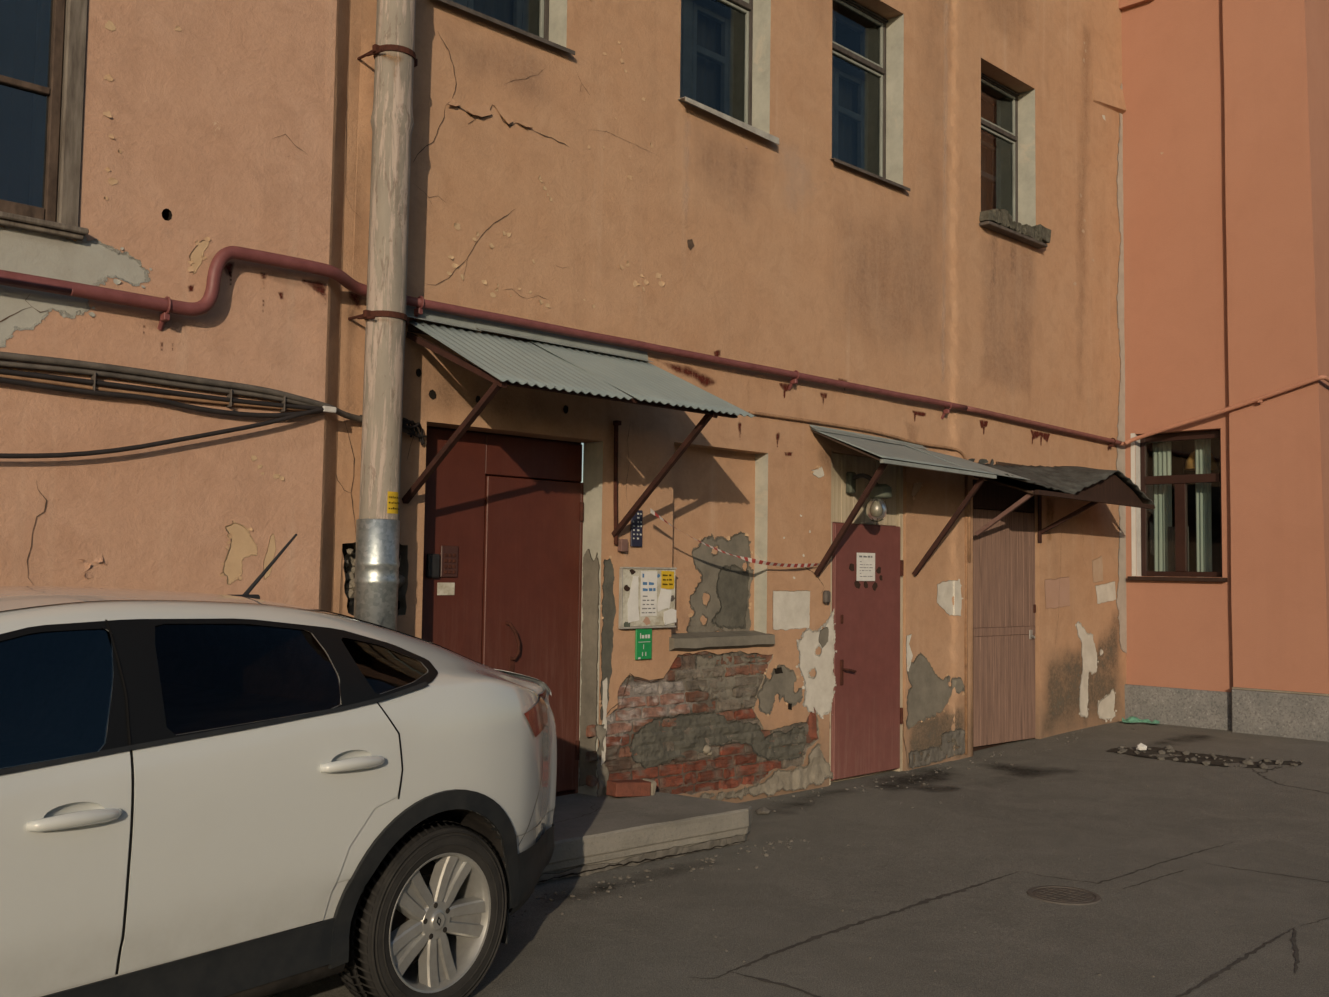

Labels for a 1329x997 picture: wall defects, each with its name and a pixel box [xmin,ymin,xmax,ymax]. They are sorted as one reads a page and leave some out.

crack [413,32,660,206]
peeling [0,227,152,348]
crack [429,209,515,285]
corrosion [670,364,714,386]
corrosion [1031,430,1050,444]
crack [27,481,47,584]
peeling [219,521,276,585]
flaking render [686,531,754,633]
spalling [579,549,837,801]
spalling [906,634,965,729]
water stain [1048,632,1117,721]
peeling [1075,621,1117,722]